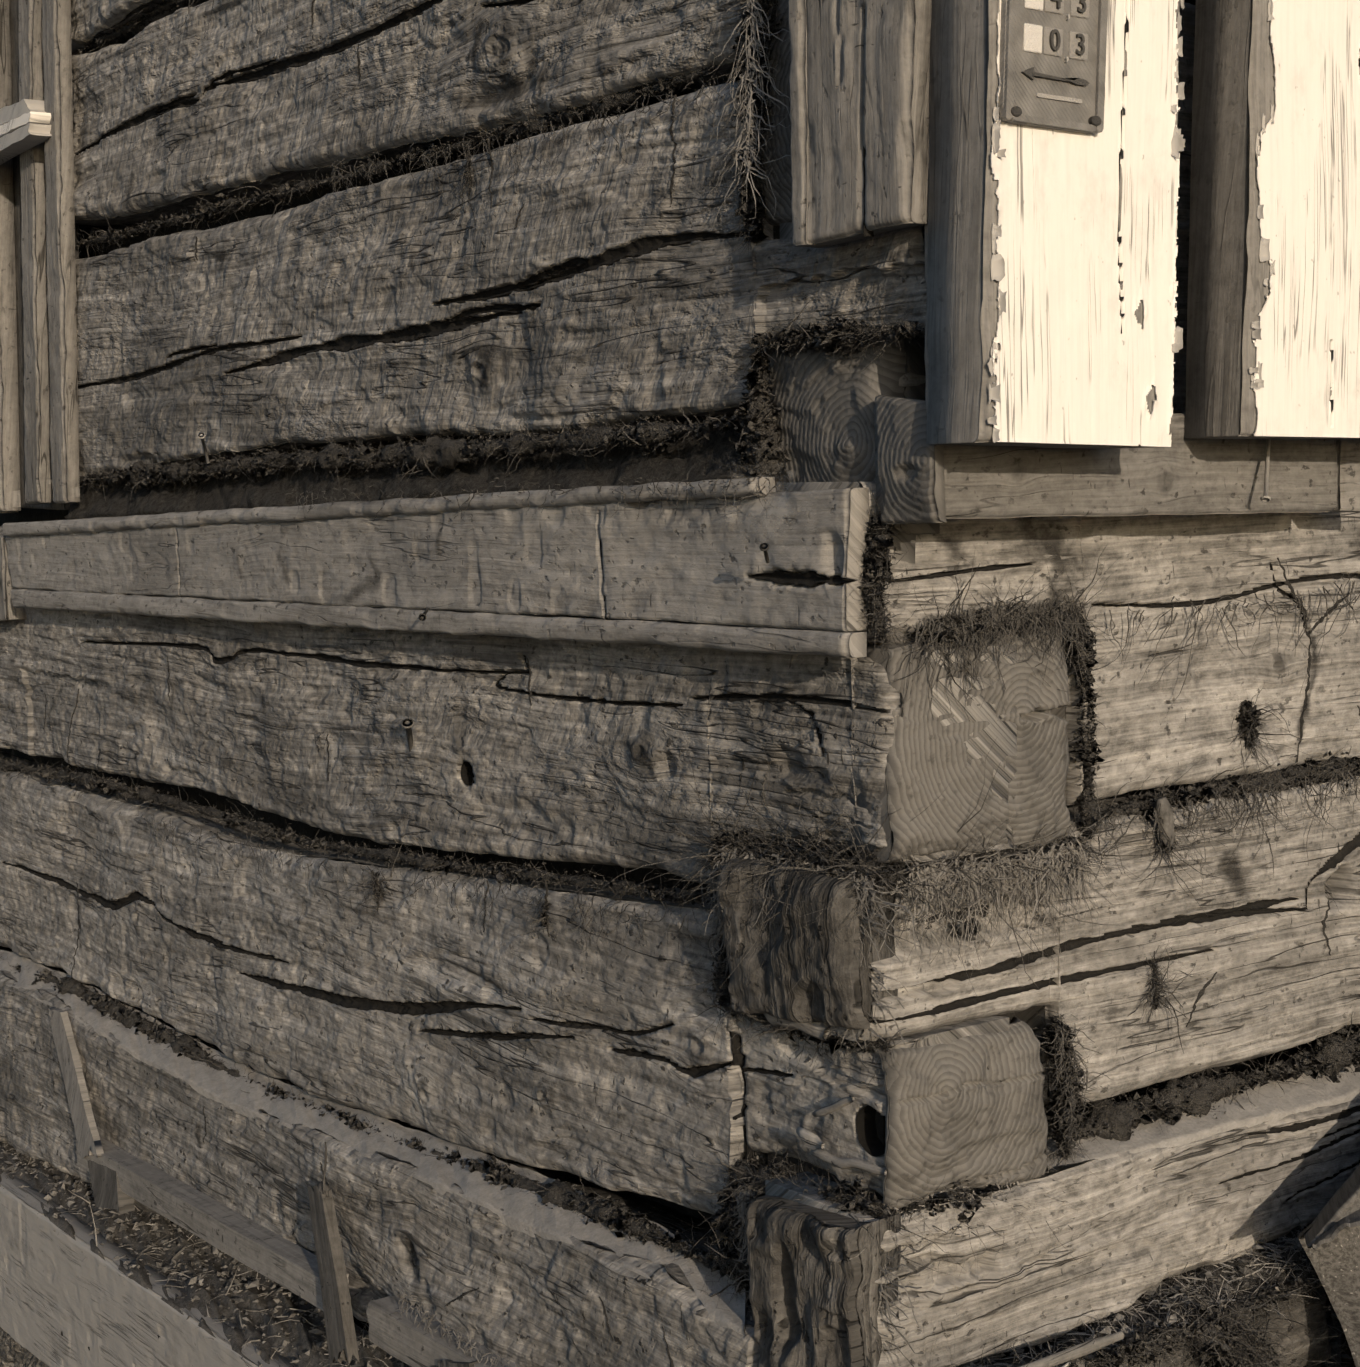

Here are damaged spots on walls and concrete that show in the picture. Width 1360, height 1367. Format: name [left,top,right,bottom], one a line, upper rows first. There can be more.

crack [76,0,443,155]
peeling [991,107,1006,157]
peeling [1170,0,1185,159]
crack [78,232,744,388]
peeling [987,342,1001,443]
peeling [991,223,1007,315]
peeling [1172,326,1183,353]
peeling [1259,238,1275,286]
crack [1092,563,1360,628]
crack [85,641,886,755]
crack [871,832,1360,1024]
crack [3,861,793,1163]